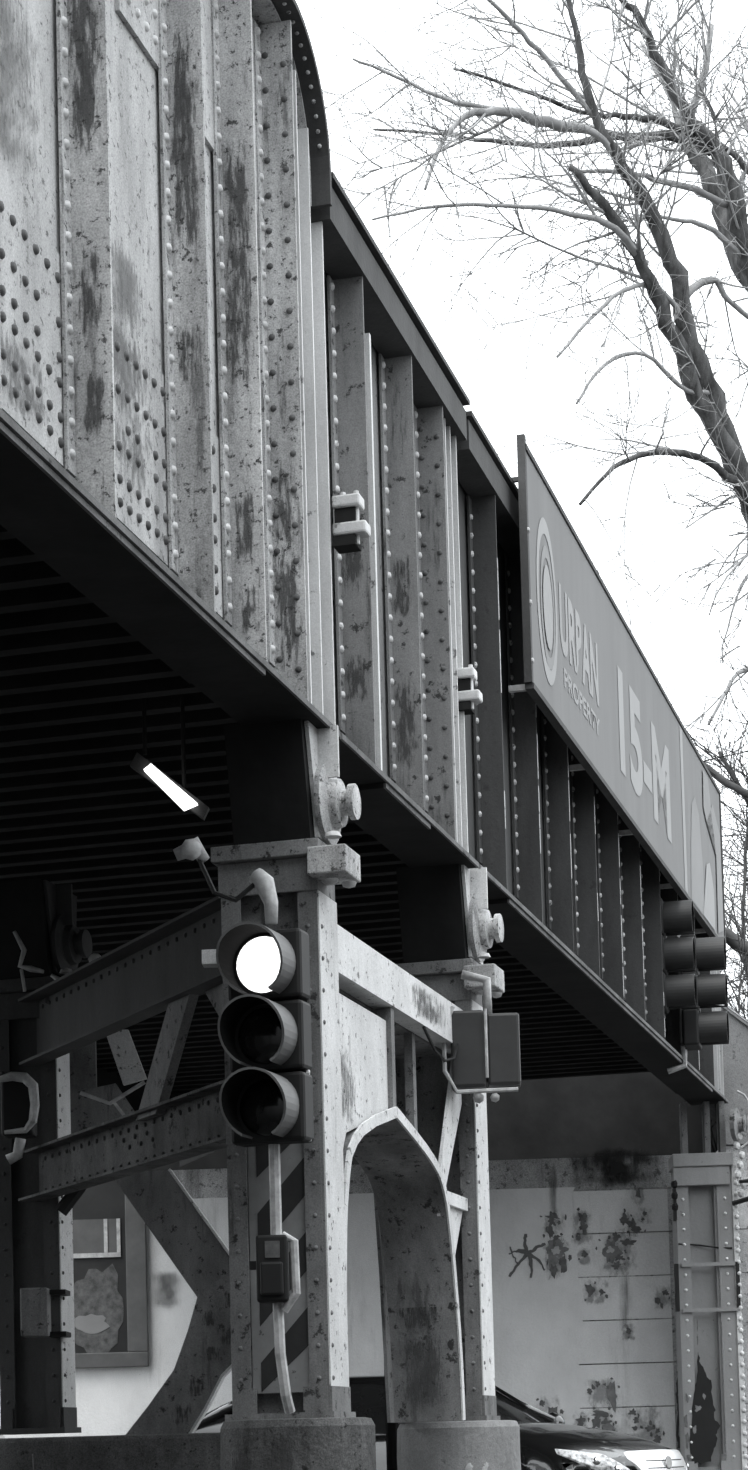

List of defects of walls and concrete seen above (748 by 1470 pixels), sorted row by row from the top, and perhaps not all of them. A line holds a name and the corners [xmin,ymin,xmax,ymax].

corrosion [0,0,41,171]
corrosion [68,0,101,150]
corrosion [170,32,199,242]
corrosion [225,144,254,381]
corrosion [78,245,150,490]
corrosion [177,330,197,380]
corrosion [235,493,254,563]
corrosion [242,469,301,668]
corrosion [341,541,363,590]
corrosion [393,558,410,616]
corrosion [347,660,366,700]
corrosion [395,685,416,766]